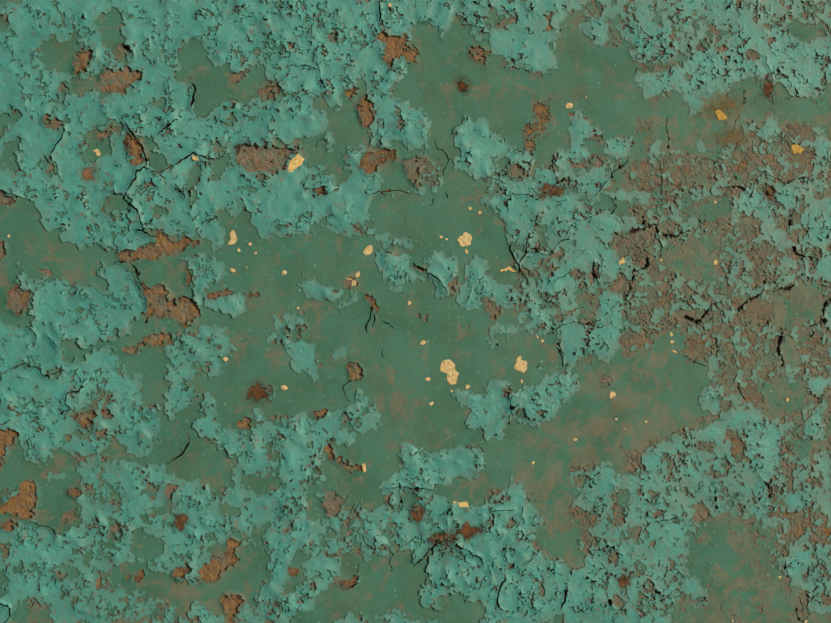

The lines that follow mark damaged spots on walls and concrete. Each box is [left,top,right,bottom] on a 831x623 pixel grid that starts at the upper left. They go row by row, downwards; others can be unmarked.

crack [113,83,226,237]
crack [365,307,393,332]
crack [508,238,569,272]
peeling [450,102,831,441]
crack [624,219,689,301]
crack [680,219,815,323]
peeling [0,251,831,623]